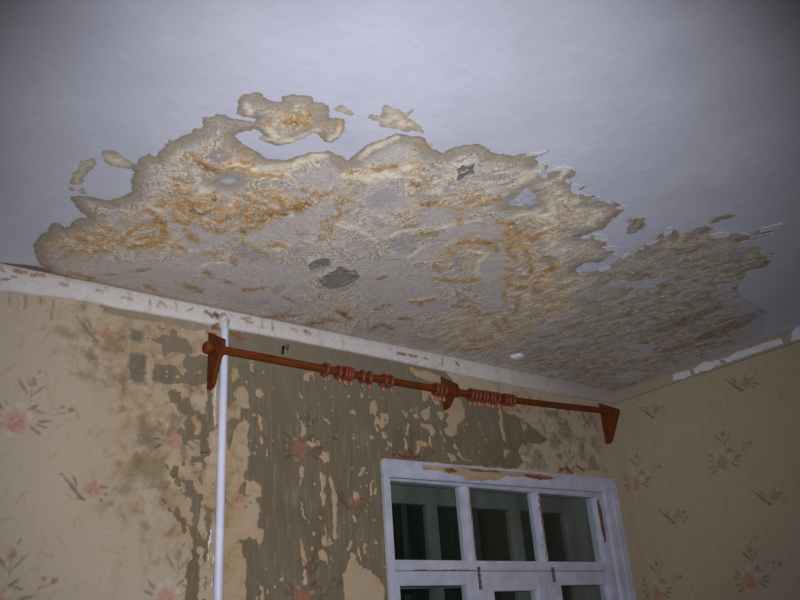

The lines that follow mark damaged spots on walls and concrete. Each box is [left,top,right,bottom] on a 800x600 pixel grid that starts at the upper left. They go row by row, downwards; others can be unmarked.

damp [128,354,146,382]
flaking render [100,305,557,600]
peeling [33,92,800,390]
peeling [597,500,606,543]